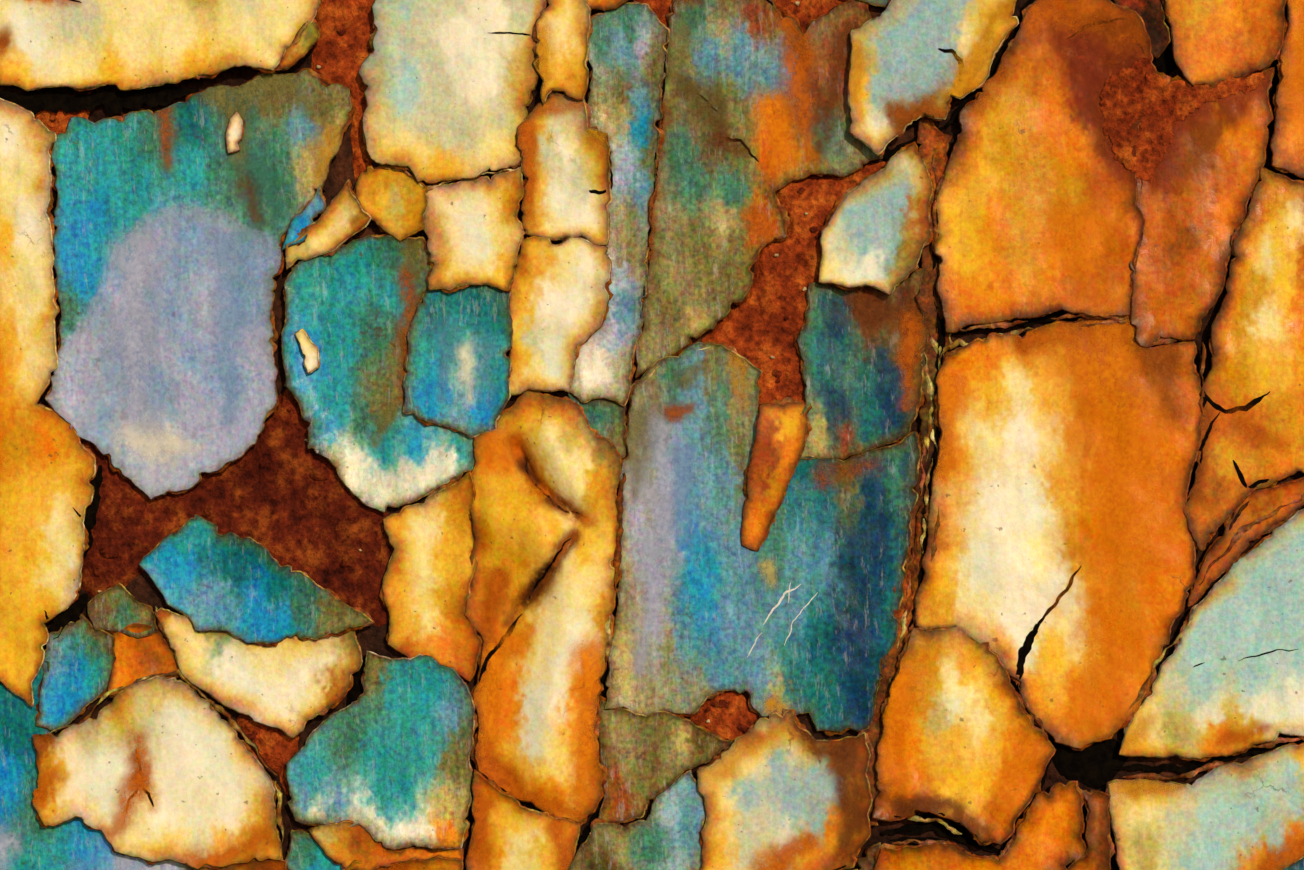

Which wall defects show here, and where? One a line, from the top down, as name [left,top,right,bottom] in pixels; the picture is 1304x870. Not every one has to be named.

corrosion [203,72,326,120]
corrosion [311,0,375,182]
corrosion [702,0,888,404]
corrosion [947,5,1006,97]
corrosion [1024,2,1268,188]
crack [931,237,1108,395]
corrosion [80,389,394,627]
peeling [0,0,626,870]
peeling [508,0,1304,870]
crack [903,427,941,648]
crack [1187,390,1270,502]
crack [834,566,1081,870]